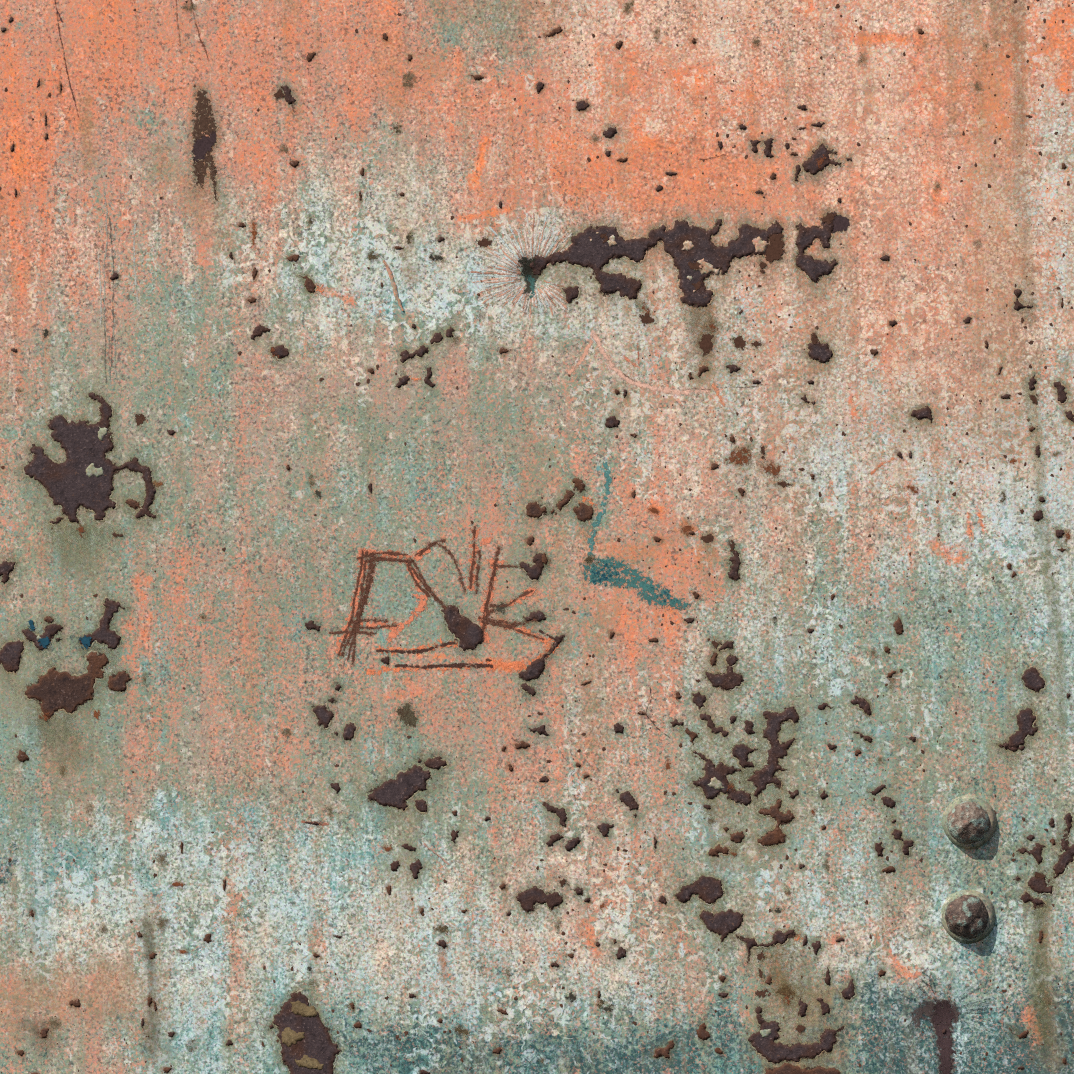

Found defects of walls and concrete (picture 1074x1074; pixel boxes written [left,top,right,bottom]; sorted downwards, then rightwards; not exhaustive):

rust [190,84,222,200]
rust [530,97,860,416]
rust [605,416,637,438]
rust [904,979,1011,1074]